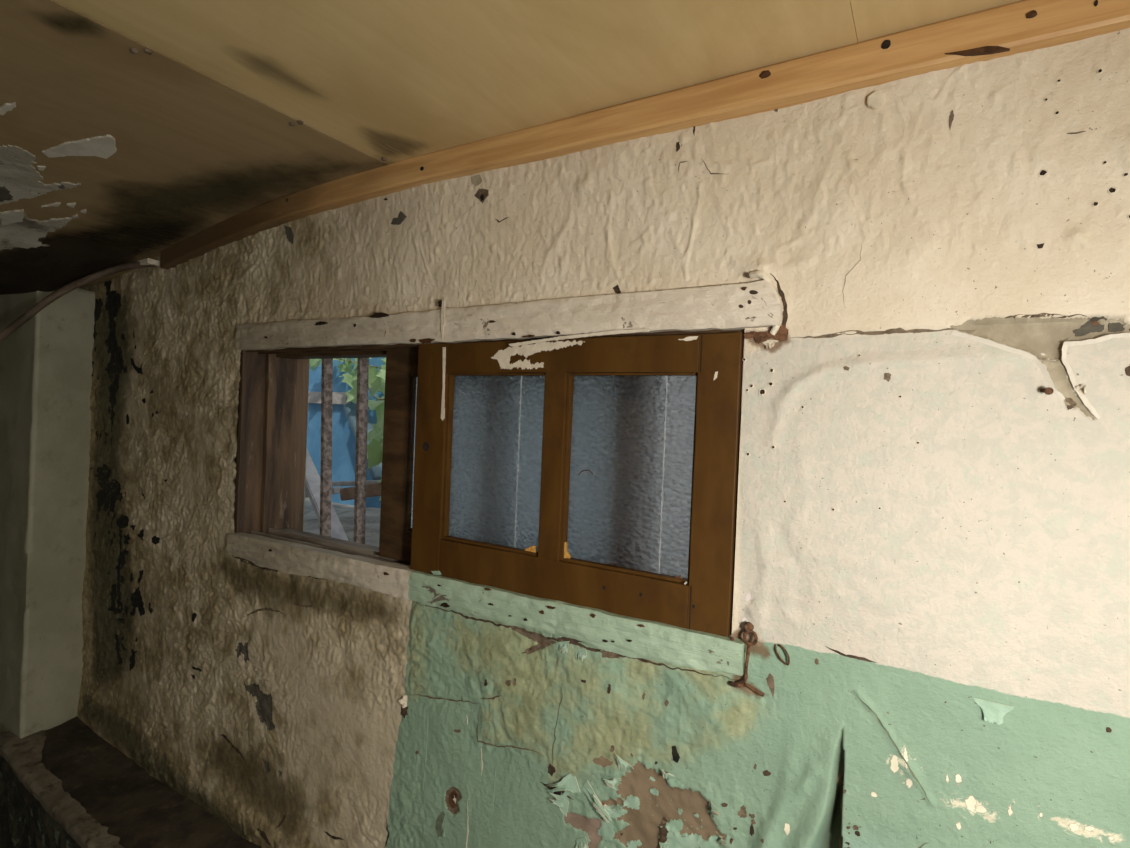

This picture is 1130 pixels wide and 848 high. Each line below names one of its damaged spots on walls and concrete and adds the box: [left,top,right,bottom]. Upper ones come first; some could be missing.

peeling [0,102,16,115]
peeling [0,135,117,250]
peeling [491,329,650,370]
flaking render [950,316,1130,419]
water stain [0,166,339,681]
corrosion [732,628,769,657]
flaking render [244,681,275,731]
peeling [890,747,913,788]
flaking render [564,745,764,848]
peeling [965,796,987,814]
peeling [1069,812,1095,832]